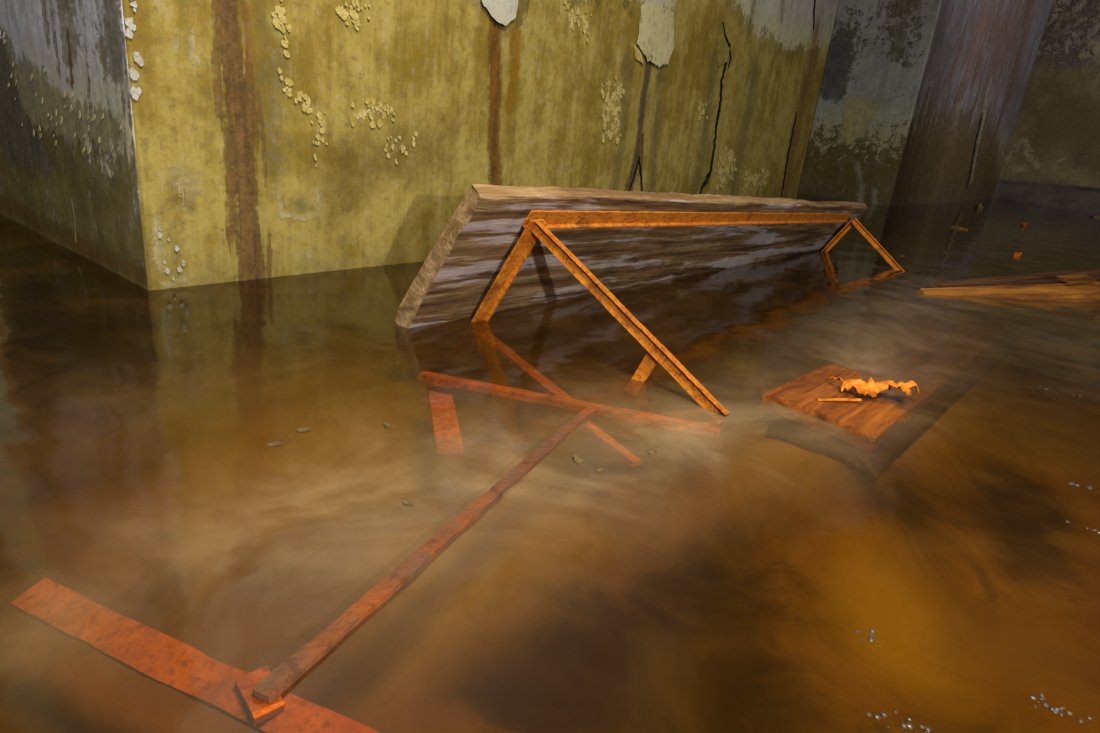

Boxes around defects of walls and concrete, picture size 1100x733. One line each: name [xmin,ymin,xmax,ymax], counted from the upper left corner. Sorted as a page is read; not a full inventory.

corrosion [211,0,272,305]
corrosion [488,17,520,186]
crack [697,22,732,194]
damp [820,32,882,145]
damp [897,94,1041,205]